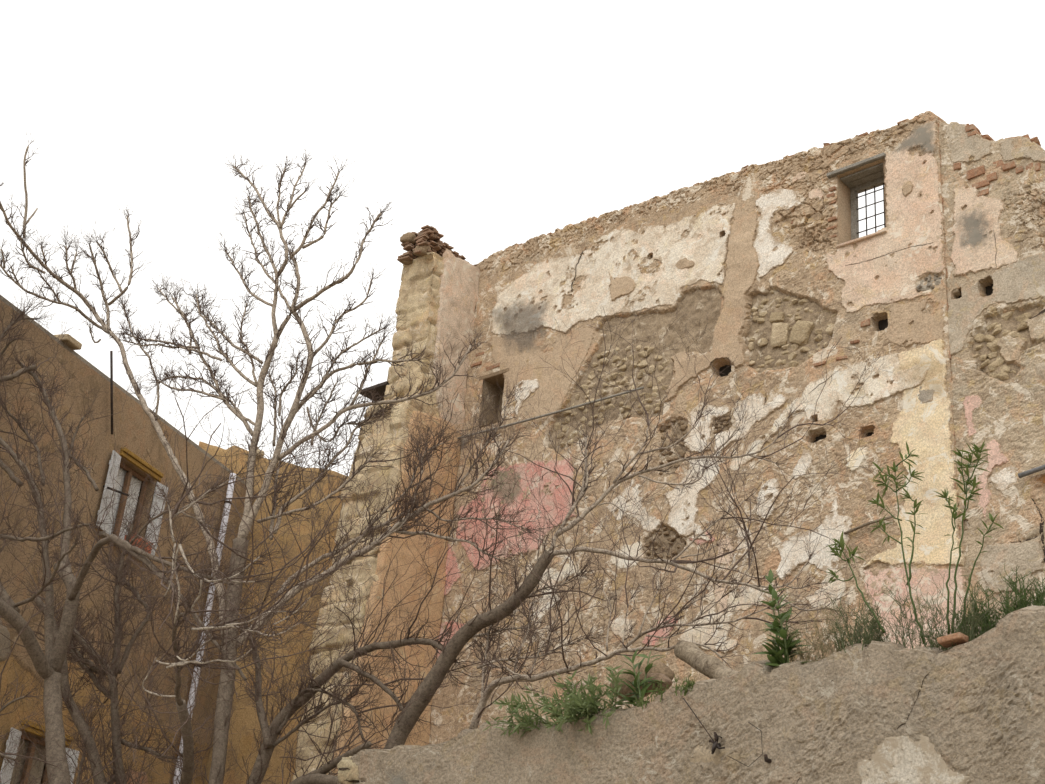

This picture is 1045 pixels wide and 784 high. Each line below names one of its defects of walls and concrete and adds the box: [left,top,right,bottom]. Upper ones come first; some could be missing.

peeling [491,120,1045,570]
peeling [528,556,575,621]
peeling [610,527,765,654]
peeling [776,497,853,610]
peeling [980,539,1045,594]
spalling [857,734,970,784]